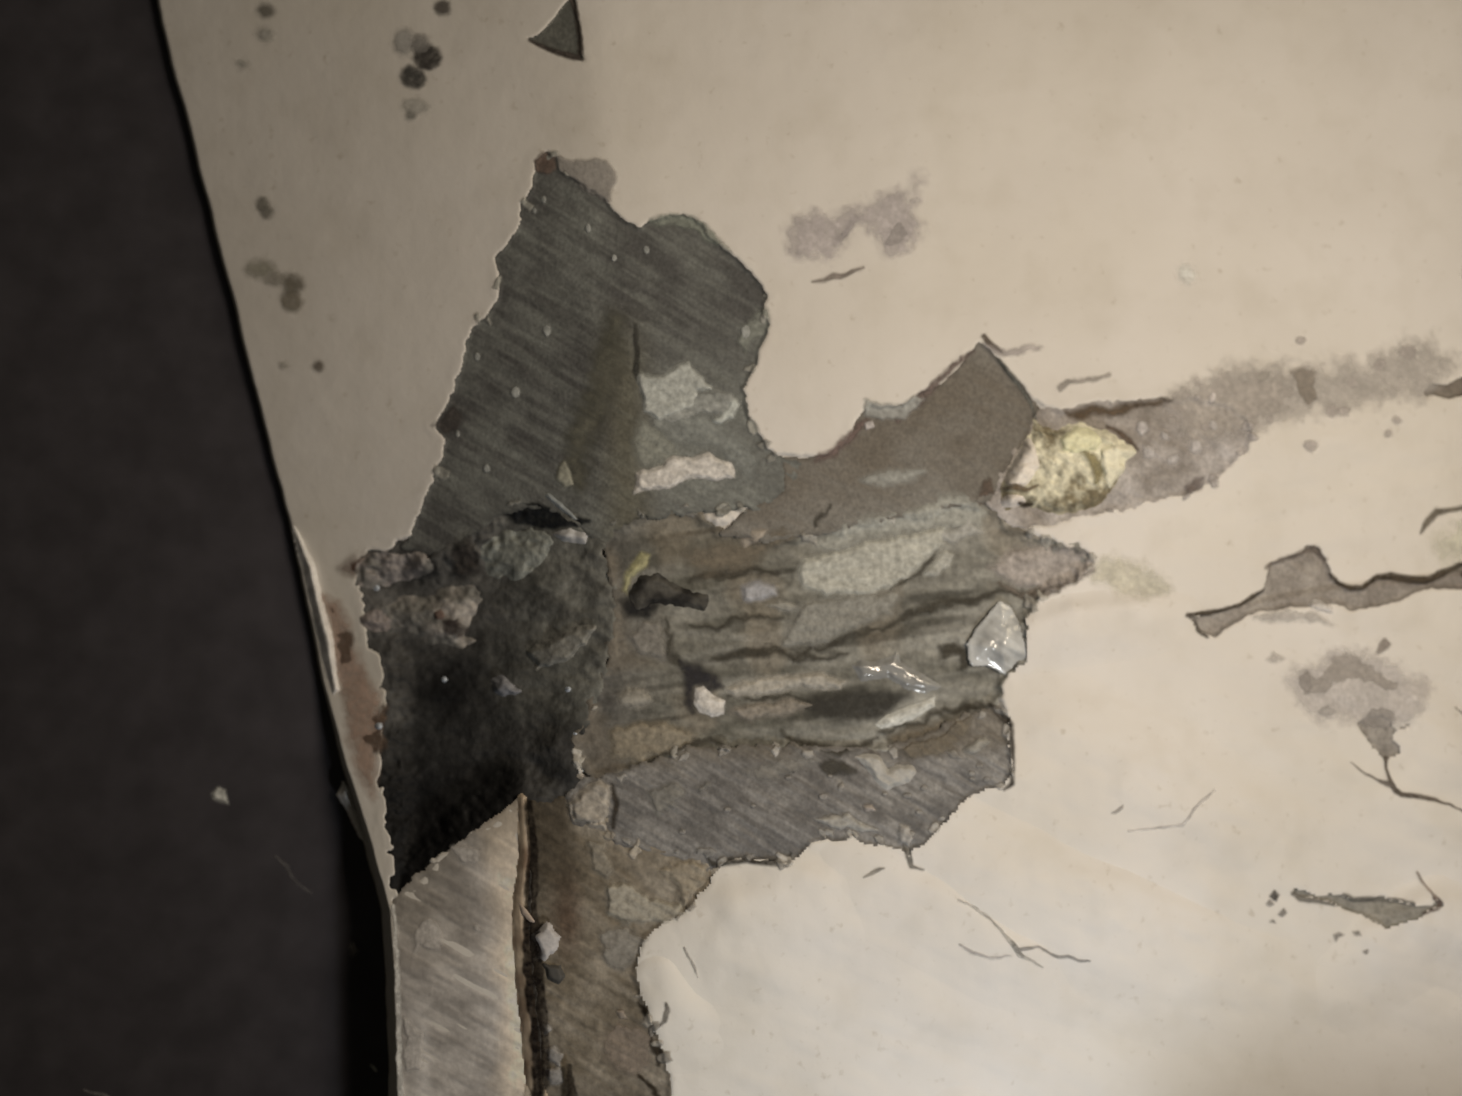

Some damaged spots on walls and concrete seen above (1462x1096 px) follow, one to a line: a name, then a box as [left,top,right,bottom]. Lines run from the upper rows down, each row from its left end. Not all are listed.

spalling [529,0,584,61]
mould [395,32,441,119]
leakage [788,192,917,282]
spalling [1424,377,1462,399]
spalling [354,151,1258,1096]
peeling [337,781,367,845]
crack [1352,756,1462,811]
spalling [1268,872,1444,954]